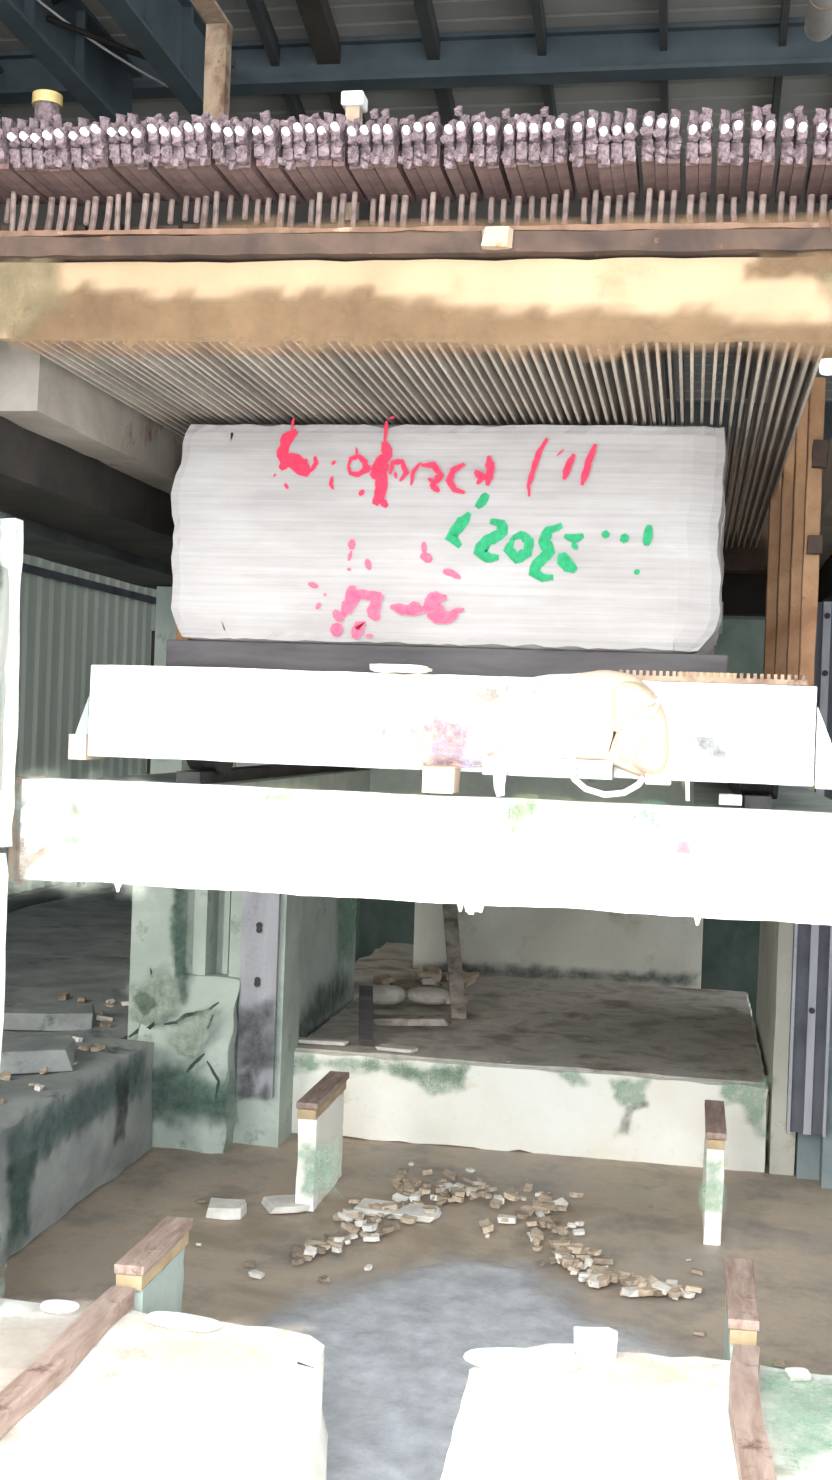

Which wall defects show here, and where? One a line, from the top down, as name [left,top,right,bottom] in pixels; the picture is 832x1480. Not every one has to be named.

leakage [0,258,55,334]
leakage [293,1057,466,1093]
leakage [9,1005,272,1241]
leakage [614,1081,645,1131]
leakage [723,1083,765,1124]
leakage [301,1147,335,1194]